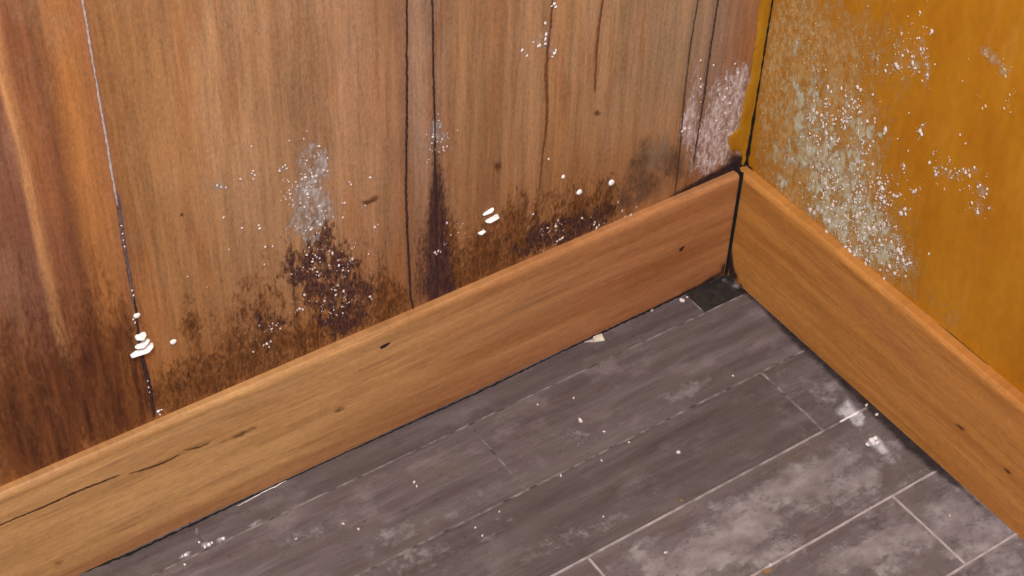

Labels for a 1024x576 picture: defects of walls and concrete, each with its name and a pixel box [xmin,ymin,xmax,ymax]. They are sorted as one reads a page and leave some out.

damp [0,130,409,475]
crack [81,0,773,574]
damp [419,60,751,301]
crack [0,443,208,526]